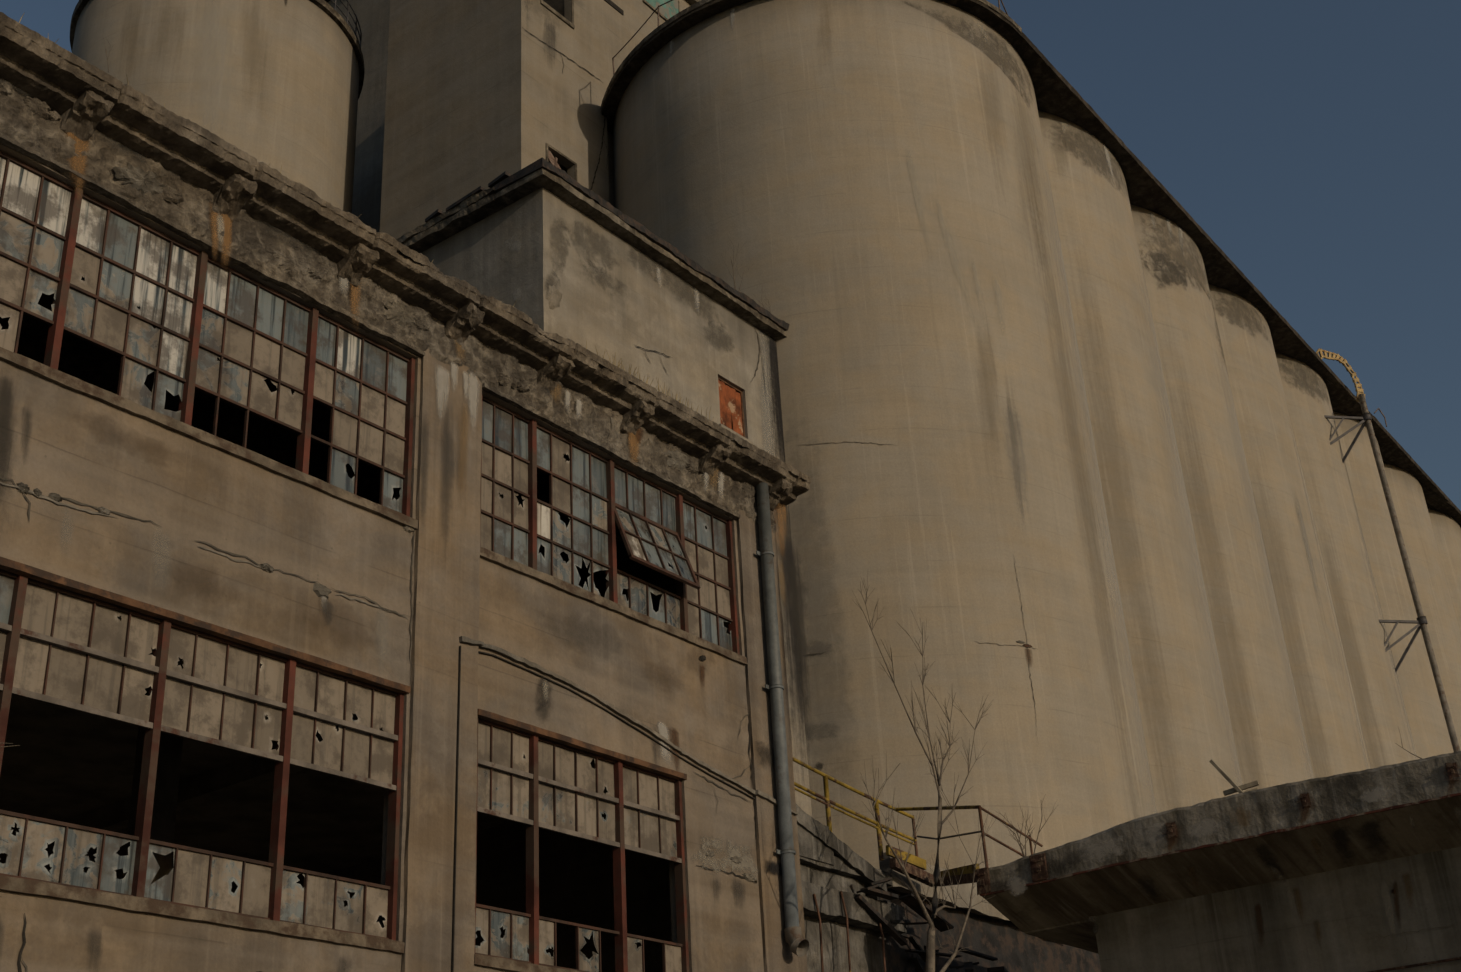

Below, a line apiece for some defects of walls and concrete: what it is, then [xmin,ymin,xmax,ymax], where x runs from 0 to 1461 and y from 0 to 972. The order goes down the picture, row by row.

leakage [0,381,11,472]
spalling [566,391,582,414]
spalling [664,450,699,474]
crack [0,476,159,526]
crack [194,530,415,668]